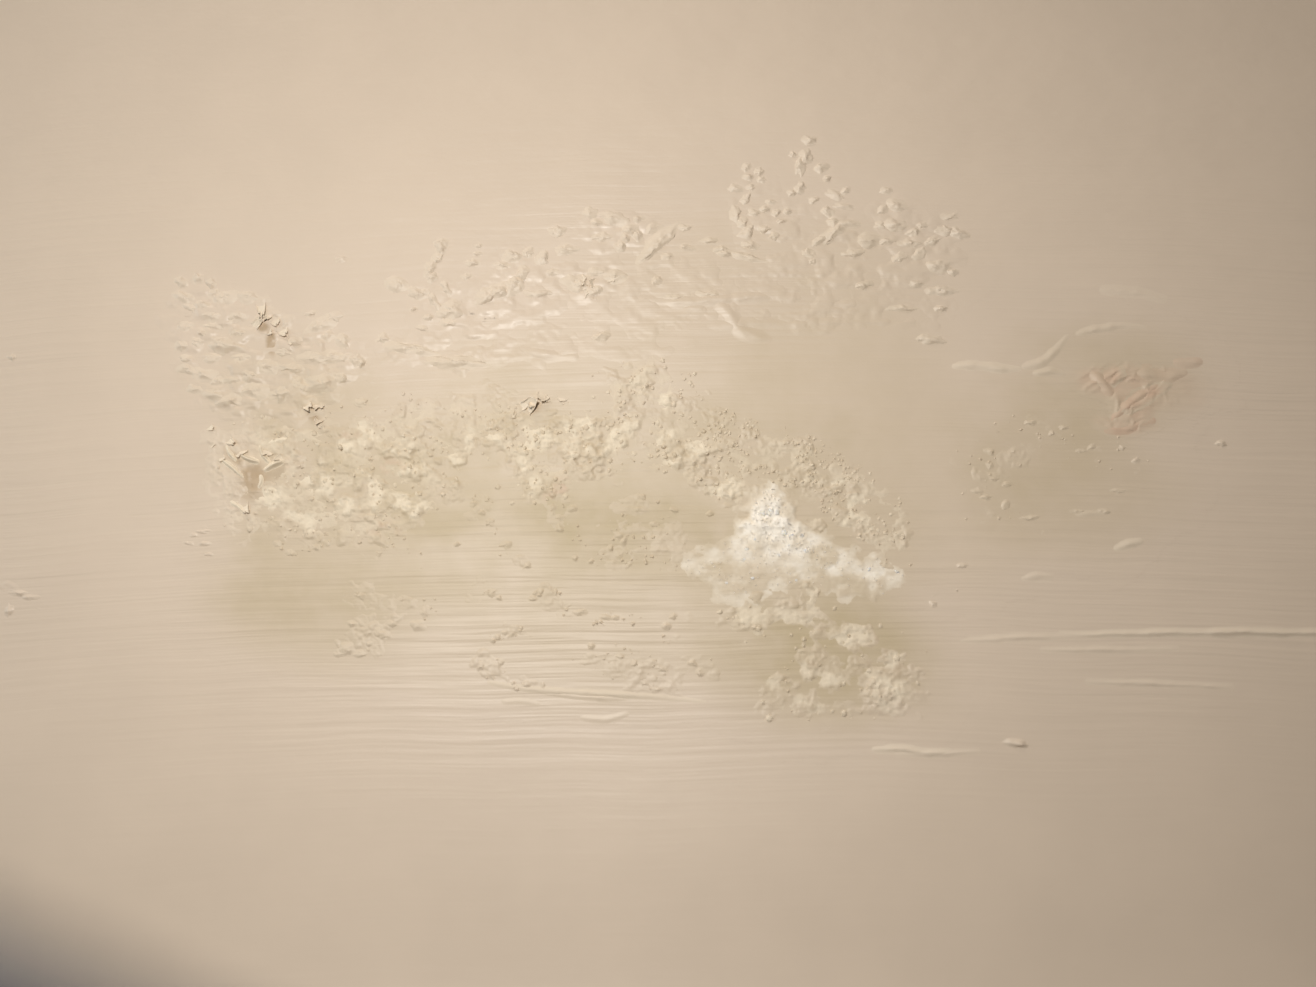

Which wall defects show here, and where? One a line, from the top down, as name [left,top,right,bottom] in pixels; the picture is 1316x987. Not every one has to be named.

peeling [198,424,287,533]
peeling [508,391,568,419]
water stain [143,185,1246,765]
flaking render [715,579,932,732]